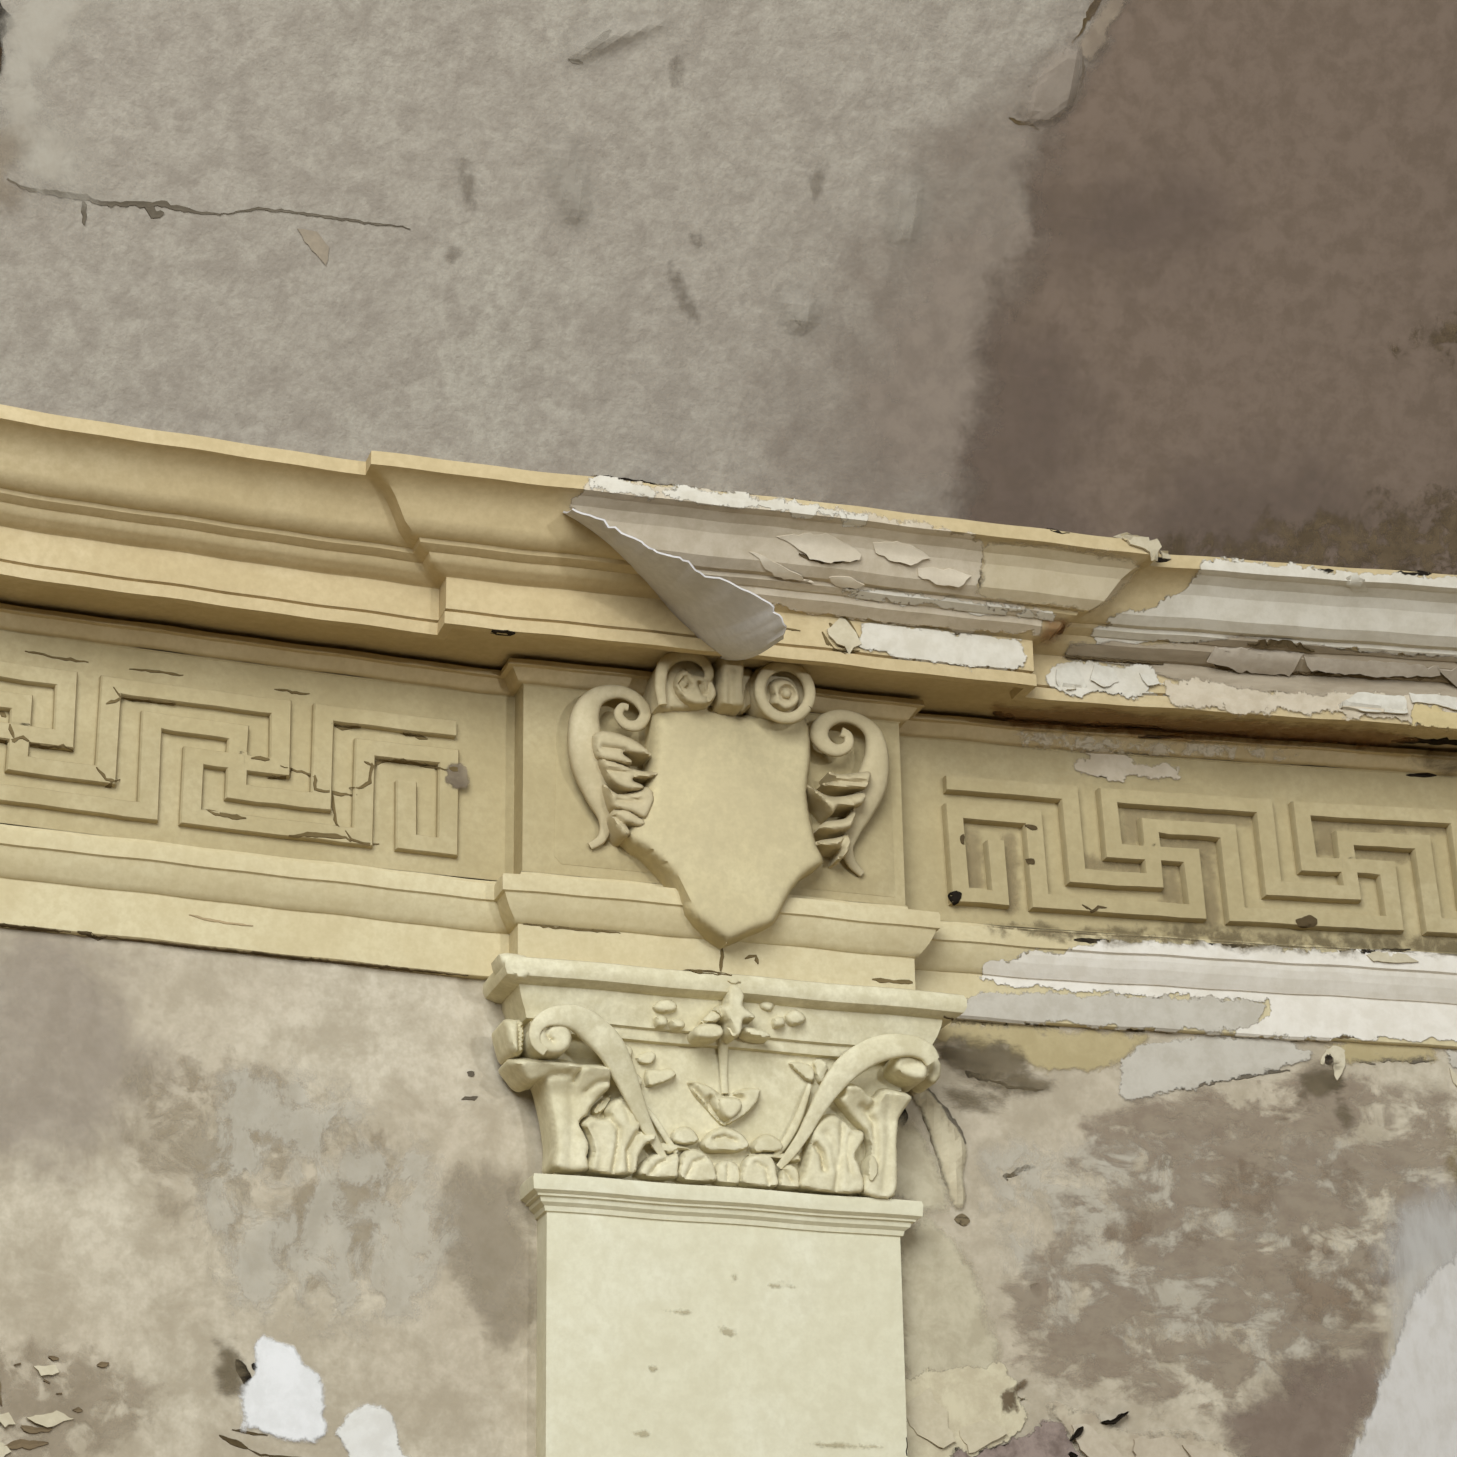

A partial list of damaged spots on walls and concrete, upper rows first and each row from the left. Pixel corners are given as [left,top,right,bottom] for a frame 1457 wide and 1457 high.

peeling [0,0,97,188]
crack [7,178,410,229]
leakage [858,0,1457,575]
peeling [563,475,1457,732]
crack [25,651,183,705]
crack [0,711,120,788]
crack [251,723,458,846]
spalling [1296,915,1317,928]
leakage [940,1045,1049,1108]
peeling [905,939,1457,1457]
leakage [982,1133,1457,1457]
peeling [0,1343,145,1457]